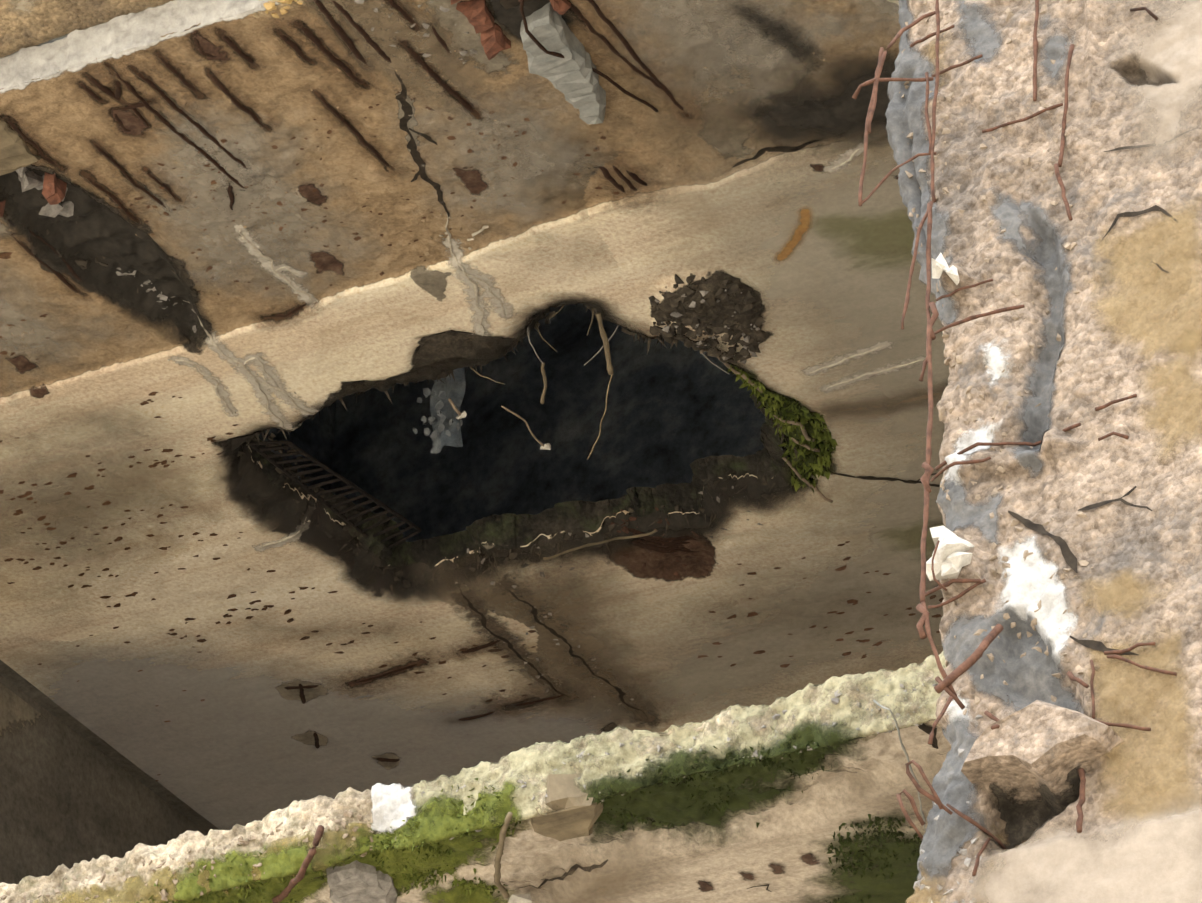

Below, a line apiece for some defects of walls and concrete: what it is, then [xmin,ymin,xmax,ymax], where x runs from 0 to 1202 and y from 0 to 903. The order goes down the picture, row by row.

spalling [0,217,189,398]
crack [395,72,450,220]
spalling [0,0,957,339]
corrosion [775,208,811,261]
spalling [212,298,799,599]
crack [833,472,944,487]
spalling [935,480,1003,544]
corrosion [934,624,1004,693]
spalling [406,607,1079,880]
spalling [0,787,387,903]